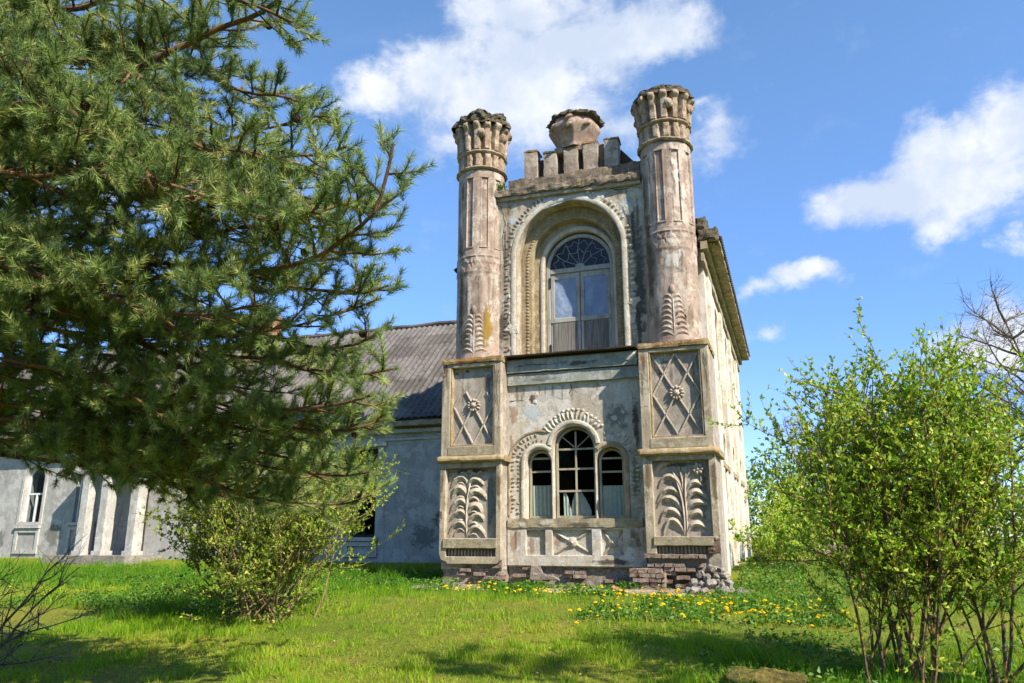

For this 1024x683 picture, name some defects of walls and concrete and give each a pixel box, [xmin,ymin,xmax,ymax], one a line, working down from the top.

water stain [482,306,507,345]
peeling [520,388,592,420]